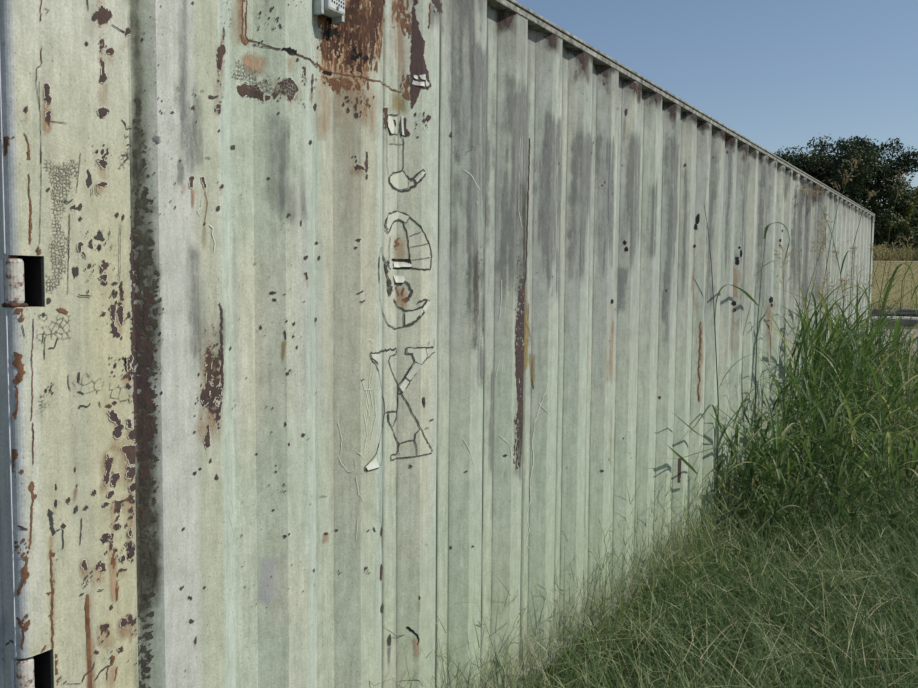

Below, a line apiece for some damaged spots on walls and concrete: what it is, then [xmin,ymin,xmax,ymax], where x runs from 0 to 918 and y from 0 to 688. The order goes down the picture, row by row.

crack [246,38,401,92]
rust [319,0,412,120]
crack [36,47,81,360]
peeling [390,171,426,189]
crack [364,114,435,471]
peeling [389,260,412,283]
peeling [402,299,431,325]
rust [12,308,35,464]
peeling [400,348,427,391]
rust [14,481,37,596]
rust [16,614,30,650]
rust [85,594,94,688]